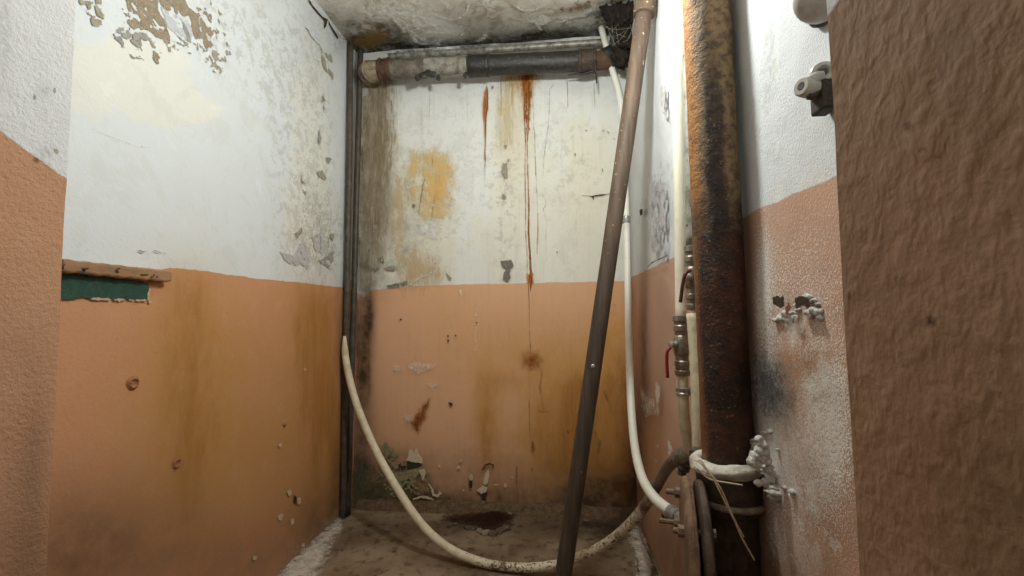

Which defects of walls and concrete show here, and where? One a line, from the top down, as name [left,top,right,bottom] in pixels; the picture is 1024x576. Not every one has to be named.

peeling [79,0,105,27]
peeling [114,0,231,74]
peeling [321,53,333,80]
leakage [359,82,455,286]
rust [509,74,539,318]
peeling [280,227,335,269]
peeling [500,260,513,282]
spalling [771,293,824,343]
leakage [751,349,786,422]
rust [412,402,428,431]
peeling [352,442,442,504]